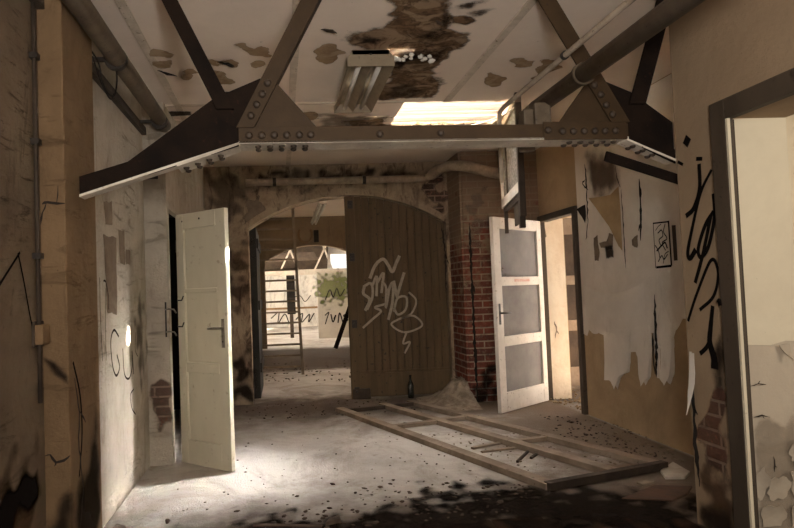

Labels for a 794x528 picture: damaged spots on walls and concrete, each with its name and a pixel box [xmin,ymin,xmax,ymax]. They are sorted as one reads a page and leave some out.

peeling [149,49,198,80]
peeling [209,59,239,93]
peeling [235,43,272,68]
damp [348,0,486,101]
peeling [484,73,507,87]
peeling [510,58,562,79]
damp [322,115,394,126]
spalling [359,118,487,126]
peeling [594,233,614,261]
peeling [686,352,695,415]
flaking render [150,379,172,432]